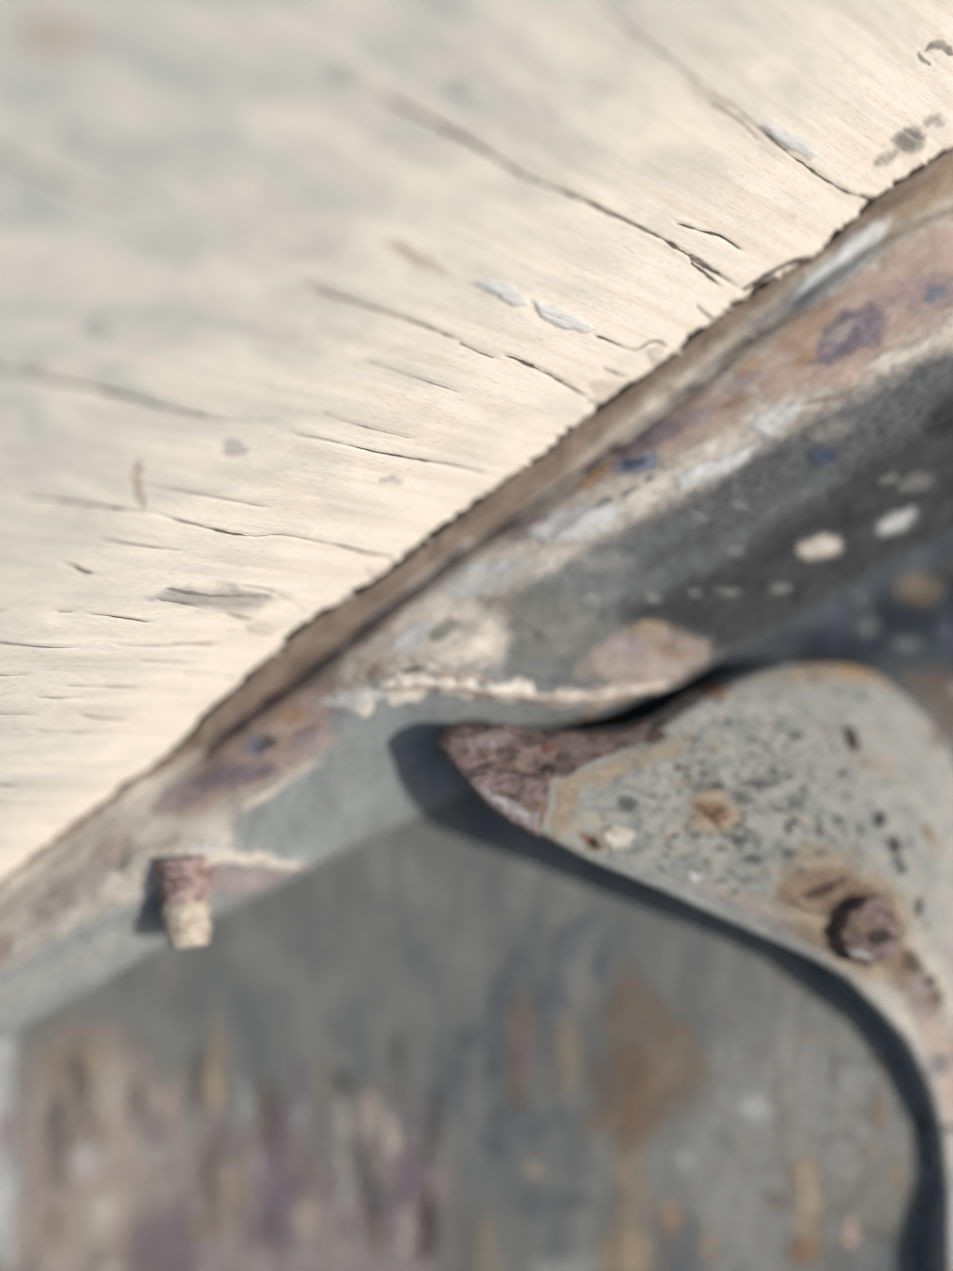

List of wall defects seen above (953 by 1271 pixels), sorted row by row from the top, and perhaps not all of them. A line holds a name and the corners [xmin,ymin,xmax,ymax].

crack [601,5,887,200]
crack [381,95,804,320]
crack [305,284,667,403]
crack [297,416,489,474]
peeling [332,194,953,684]
corrosion [579,620,709,685]
corrosion [542,684,734,778]
spalling [844,726,859,753]
peeling [0,756,308,1022]
corrosion [689,791,741,833]
corrosion [775,849,942,1015]
spalling [858,811,913,875]